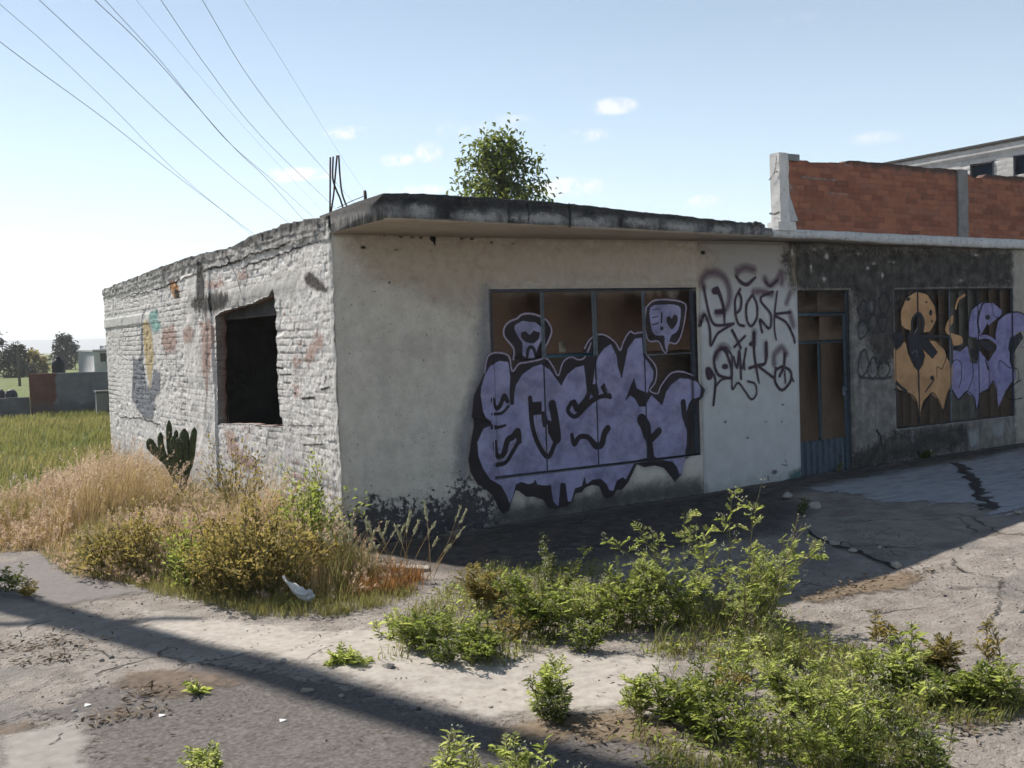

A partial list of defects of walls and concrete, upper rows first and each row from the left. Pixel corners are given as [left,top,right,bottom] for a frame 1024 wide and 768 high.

damp [336,294,702,547]